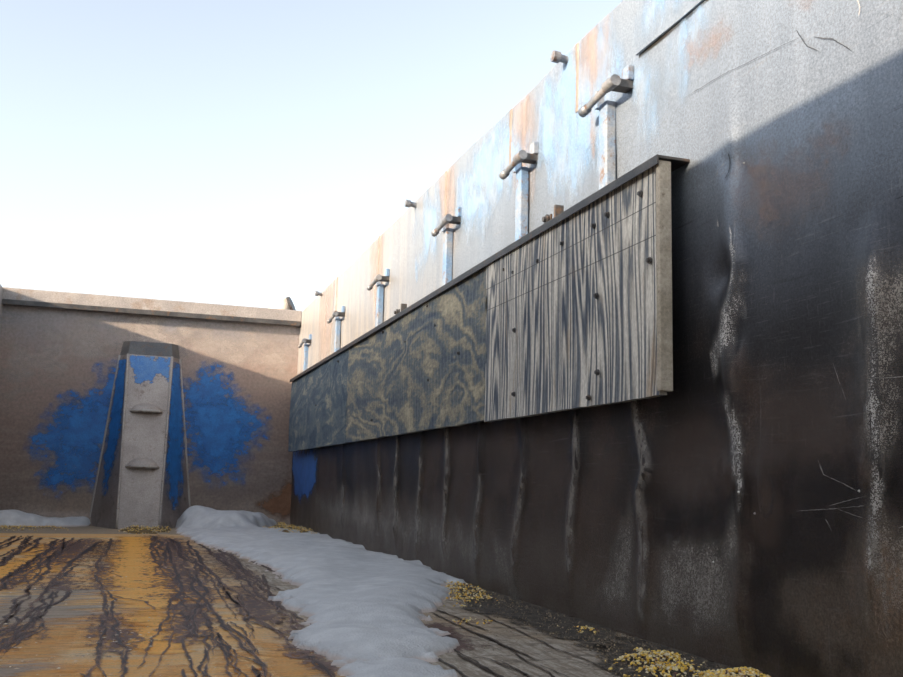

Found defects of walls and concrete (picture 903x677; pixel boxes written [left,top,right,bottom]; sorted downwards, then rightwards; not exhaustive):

peeling [26,355,271,509]